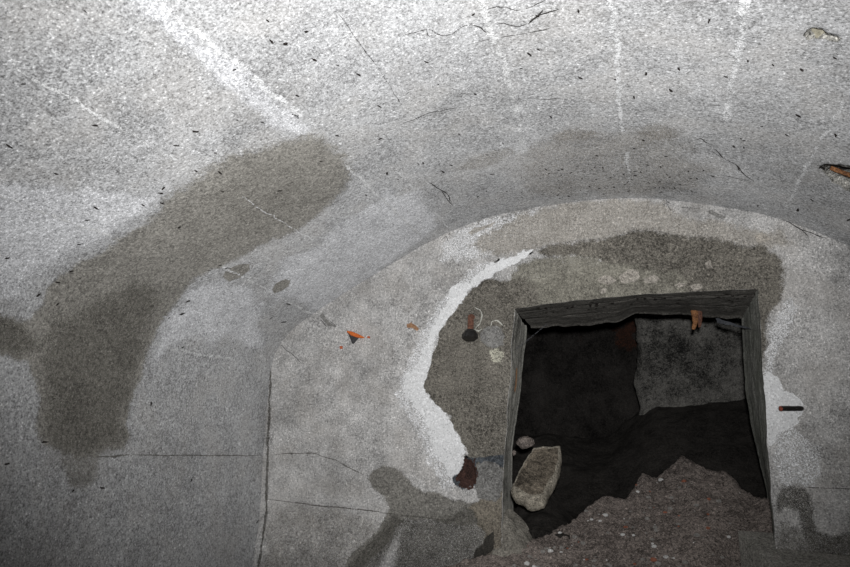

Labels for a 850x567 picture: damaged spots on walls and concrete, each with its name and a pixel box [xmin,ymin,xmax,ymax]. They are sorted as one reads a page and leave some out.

crack [406,0,559,44]
spalling [803,27,841,42]
water stain [456,118,725,200]
water stain [0,0,506,494]
water stain [259,208,850,567]
corrosion [452,454,504,490]